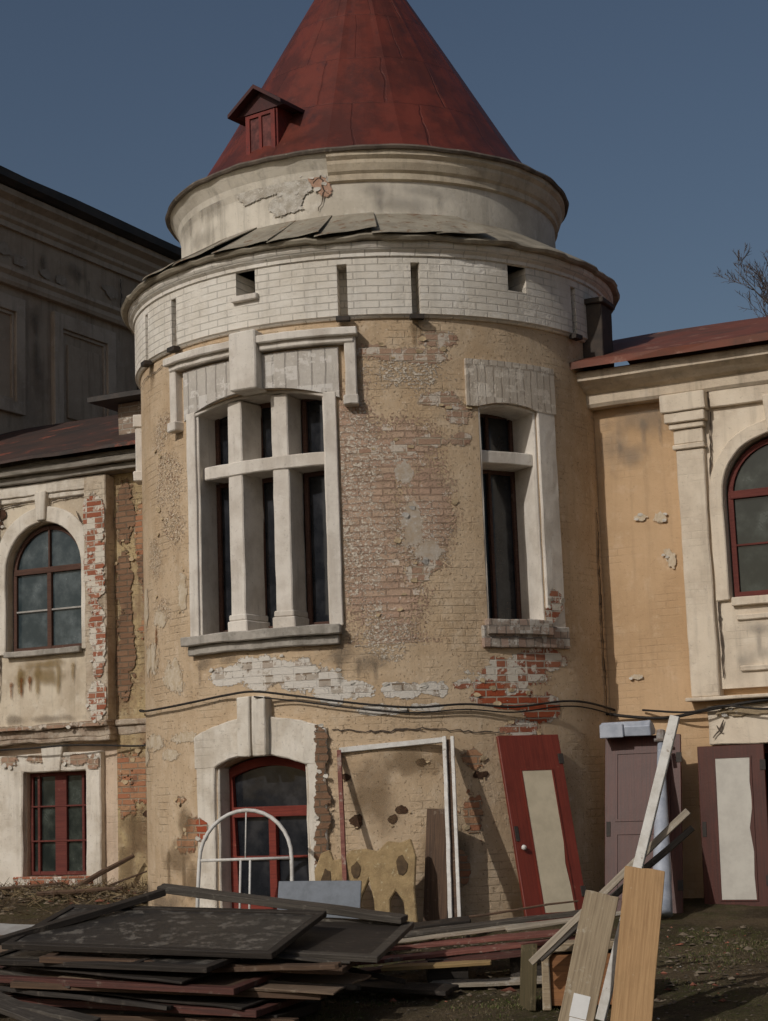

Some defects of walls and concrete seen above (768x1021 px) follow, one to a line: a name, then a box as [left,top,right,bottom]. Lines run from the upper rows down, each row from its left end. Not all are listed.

peeling [236,175,332,218]
spalling [339,330,476,665]
flaking render [0,412,188,731]
flaking render [545,587,565,623]
flaking render [208,648,568,736]
spalling [1,755,43,770]
spalling [61,753,98,769]
flaking render [117,731,197,820]
spalling [175,814,208,856]
spalling [313,724,331,868]